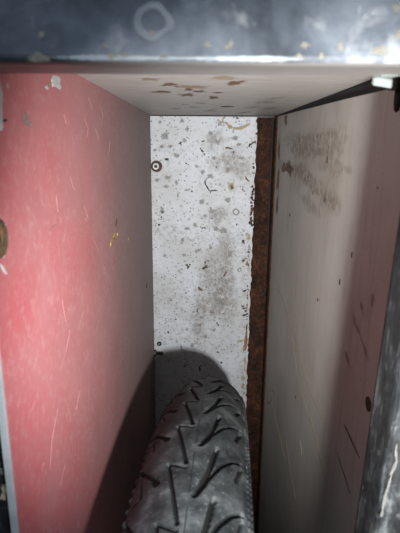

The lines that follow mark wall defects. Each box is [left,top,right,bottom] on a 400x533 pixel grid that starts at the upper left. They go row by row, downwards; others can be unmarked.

peeling [45,75,61,90]
corrosion [152,83,203,97]